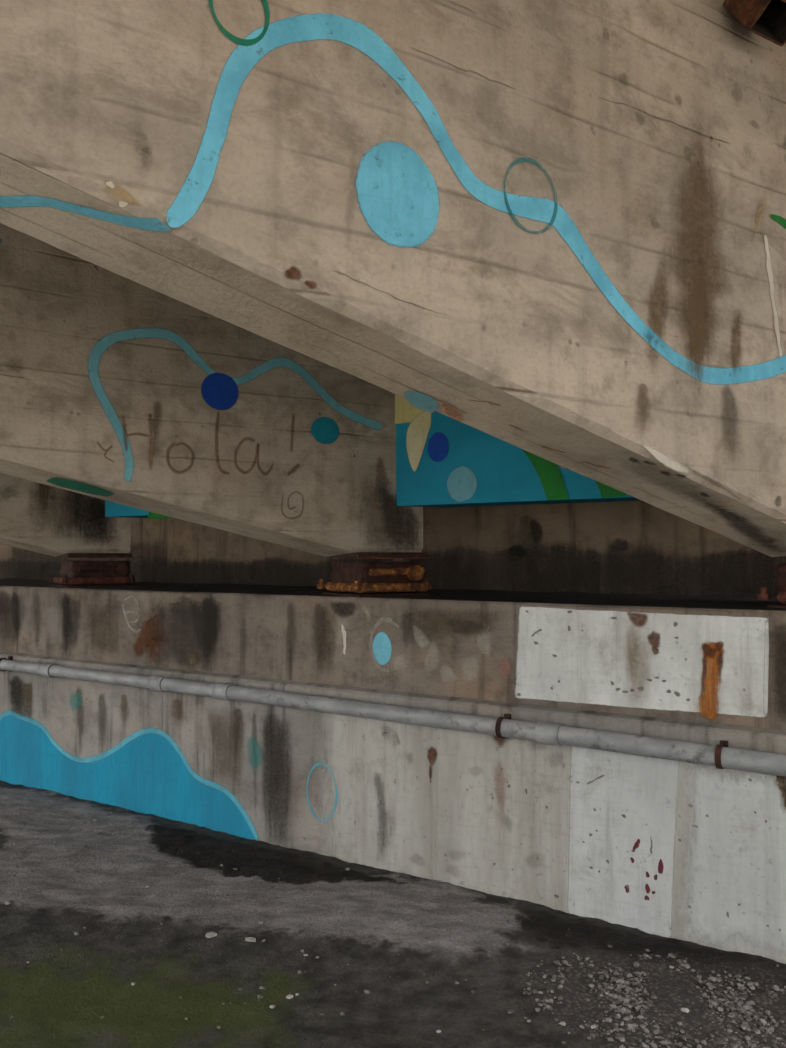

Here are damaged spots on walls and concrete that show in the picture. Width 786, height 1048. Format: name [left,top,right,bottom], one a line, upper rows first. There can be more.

water stain [677,149,721,367]
water stain [651,275,667,353]
water stain [732,316,741,367]
water stain [0,493,786,597]
water stain [63,596,77,643]
corrosion [134,617,162,656]
corrosion [628,613,660,654]
corrosion [699,641,724,719]
corrosion [428,748,437,779]
spalling [776,775,786,807]